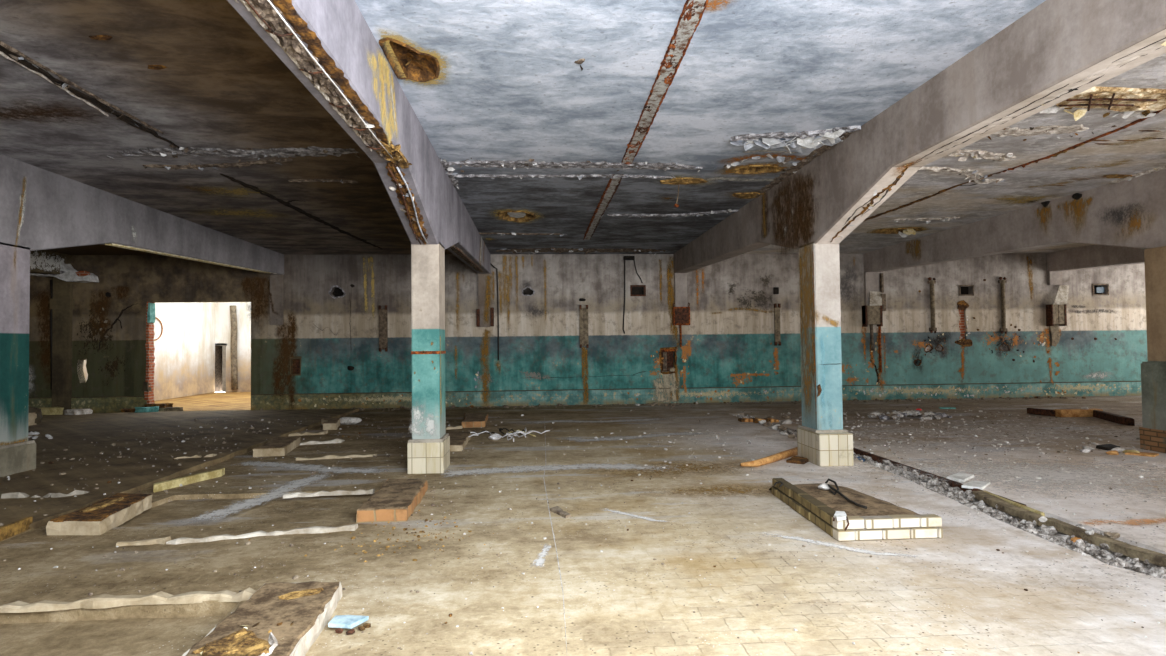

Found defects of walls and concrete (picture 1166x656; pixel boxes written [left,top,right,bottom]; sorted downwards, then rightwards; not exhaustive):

crack [0,41,183,152]
water stain [368,53,412,169]
spalling [379,32,447,85]
corrosion [583,0,730,240]
peeling [706,129,854,183]
crack [831,38,1165,242]
spalling [987,86,1166,157]
corrosion [481,272,500,404]
flaking render [627,340,780,402]
water stain [712,274,774,314]
water stain [732,176,815,408]
spalling [912,300,1047,366]